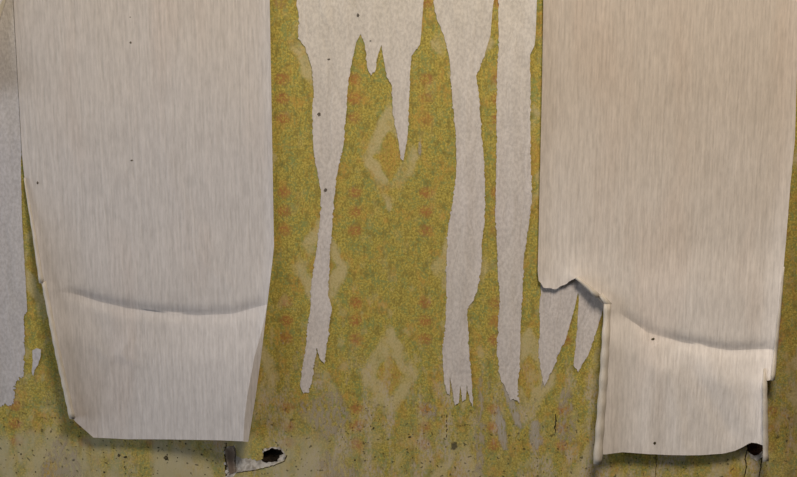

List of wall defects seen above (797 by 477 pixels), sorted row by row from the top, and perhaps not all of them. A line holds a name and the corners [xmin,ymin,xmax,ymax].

peeling [13,0,287,477]
peeling [538,0,797,465]